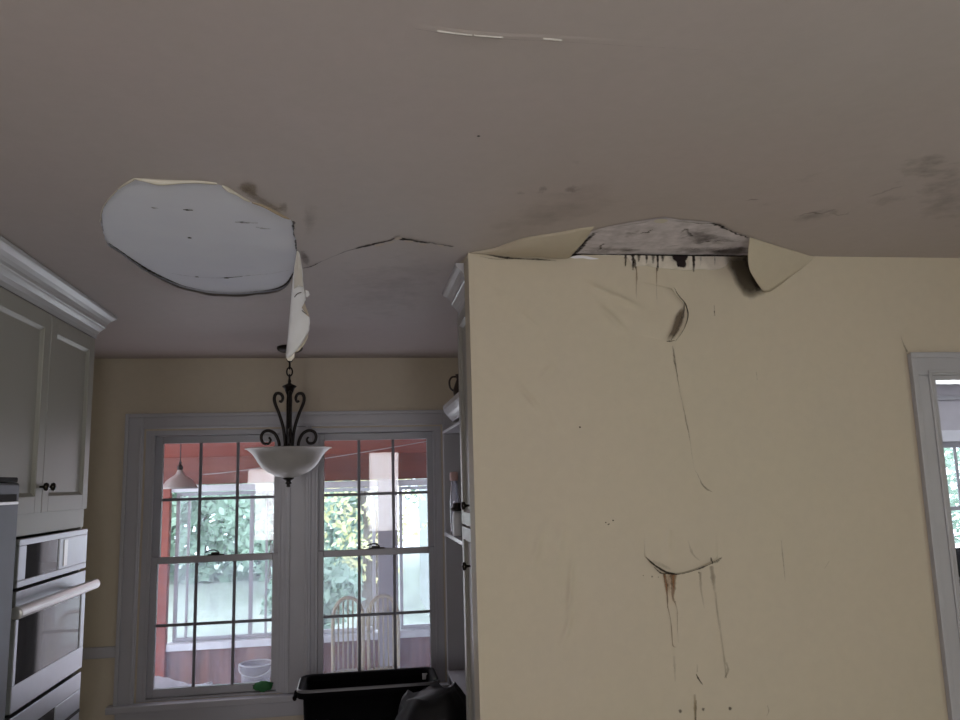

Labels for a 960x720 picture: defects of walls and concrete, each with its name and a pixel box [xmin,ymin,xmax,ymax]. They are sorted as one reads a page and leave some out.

crack [356,237,452,249]
peeling [470,227,606,261]
water stain [571,233,761,294]
peeling [621,255,730,271]
peeling [748,237,814,293]